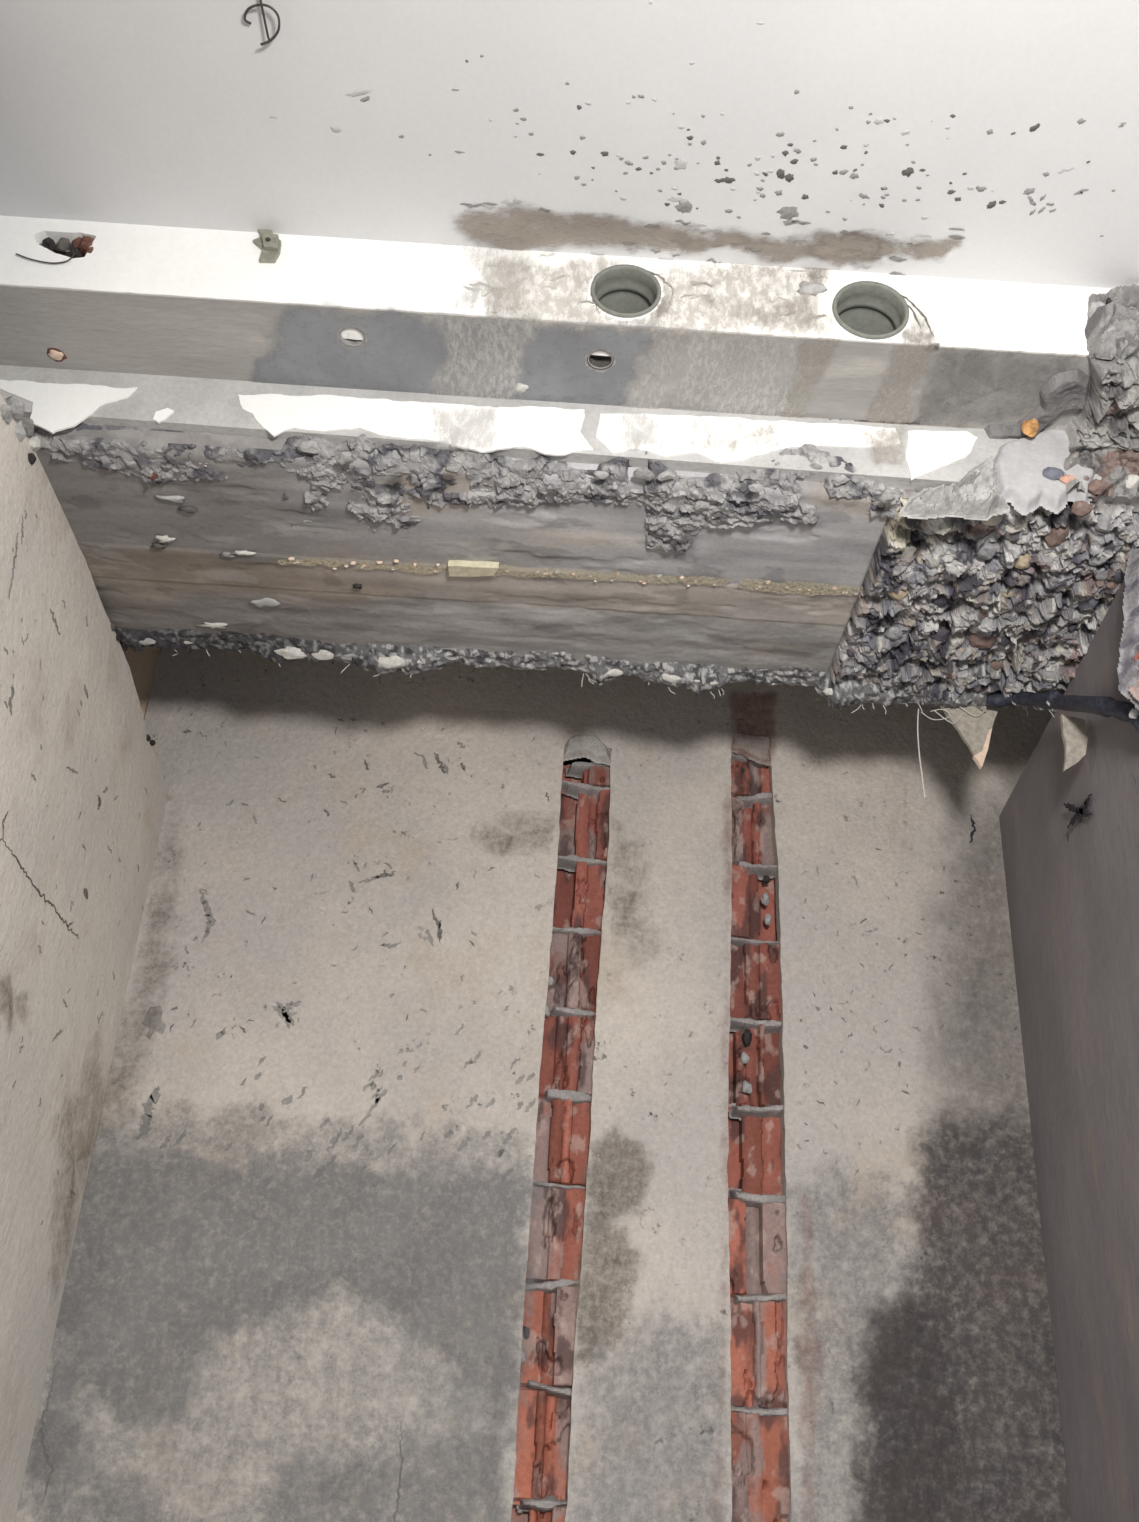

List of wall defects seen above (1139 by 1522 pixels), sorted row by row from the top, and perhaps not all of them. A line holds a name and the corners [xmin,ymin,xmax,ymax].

spalling [16,236,94,264]
leakage [254,197,965,448]
leakage [868,335,1069,462]
spalling [0,284,1139,717]
crack [0,811,79,939]
spalling [425,909,442,946]
spalling [272,1000,302,1029]
spalling [136,1086,186,1149]
spalling [304,1048,420,1180]
leakage [577,1136,645,1359]
leakage [19,1111,535,1522]
leakage [797,1116,1072,1522]